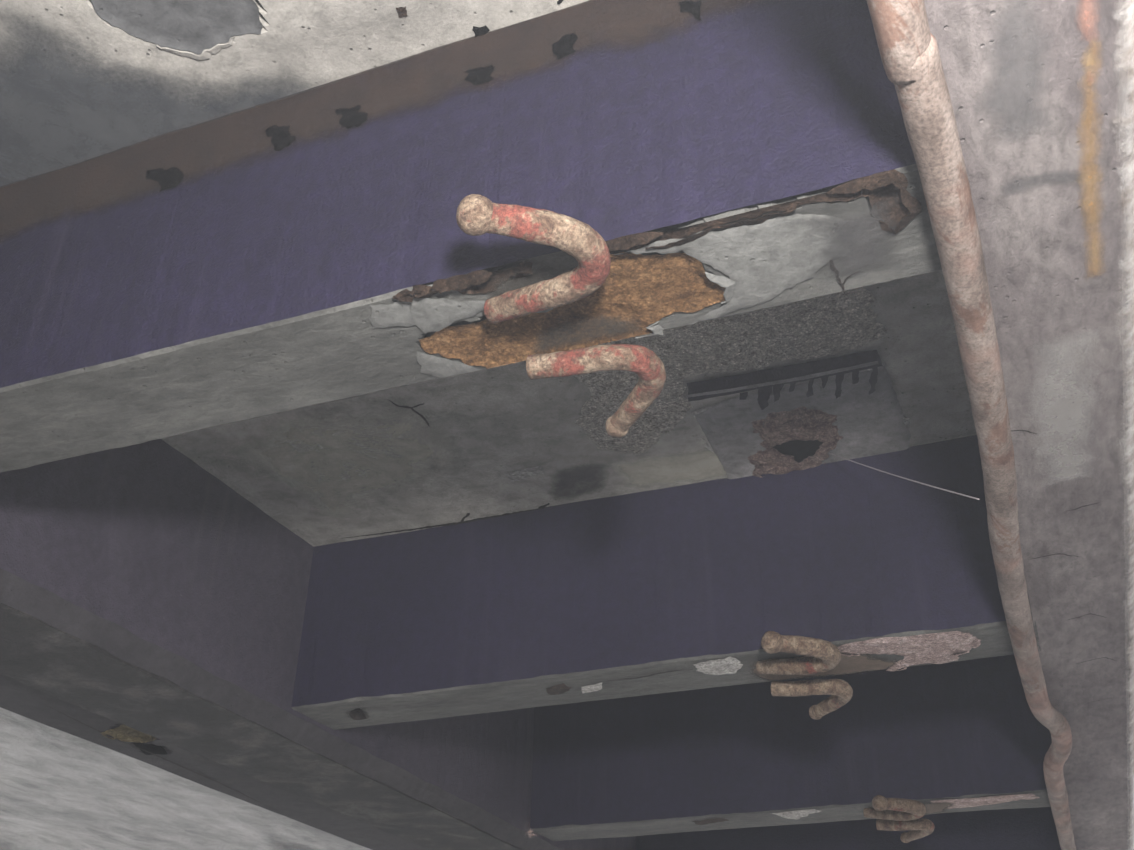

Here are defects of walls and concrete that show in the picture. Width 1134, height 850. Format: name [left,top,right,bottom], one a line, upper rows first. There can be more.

spalling [265,125,296,151]
spalling [146,167,184,191]
peeling [369,261,533,333]
corrosion [419,252,736,369]
spalling [573,170,922,455]
peeling [416,351,480,378]
crack [387,399,429,426]
spalling [748,406,844,478]
leakage [552,465,603,497]
peeling [838,631,981,671]
spalling [133,742,167,755]
peeling [930,793,1040,809]